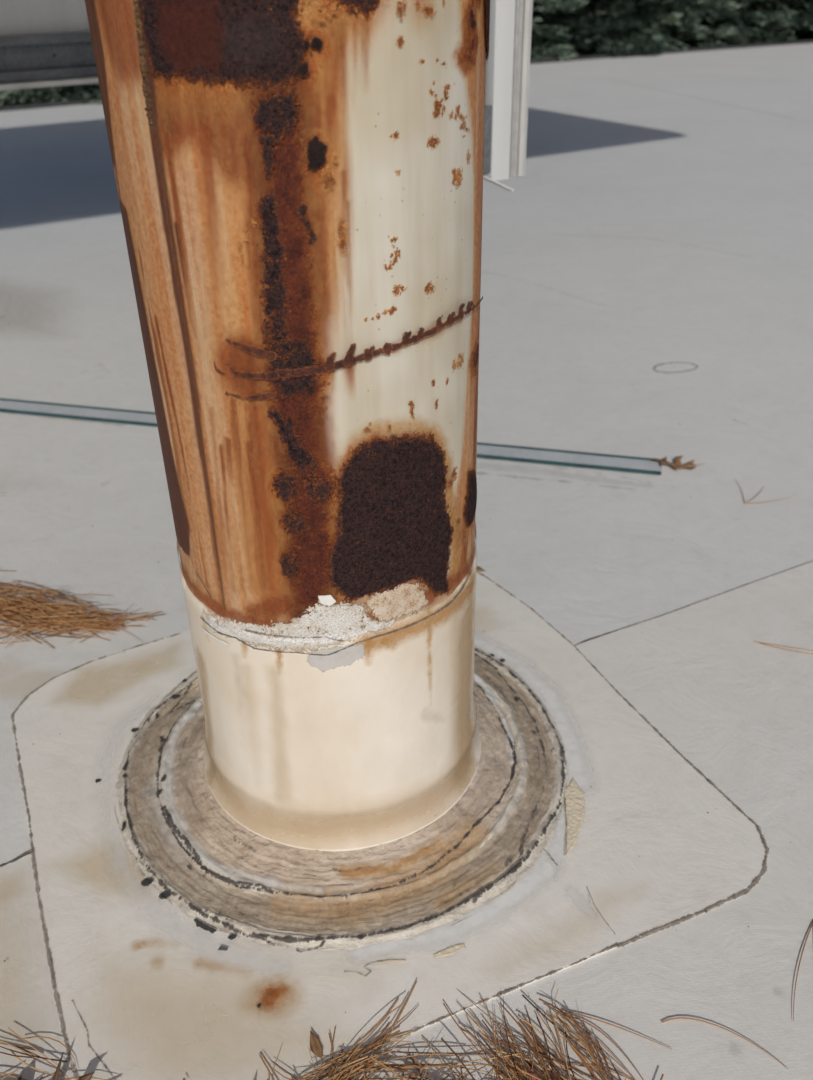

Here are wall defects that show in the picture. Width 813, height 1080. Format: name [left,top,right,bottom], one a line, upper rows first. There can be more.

corrosion [85,0,490,653]
peeling [200,582,430,672]
corrosion [257,986,289,1010]